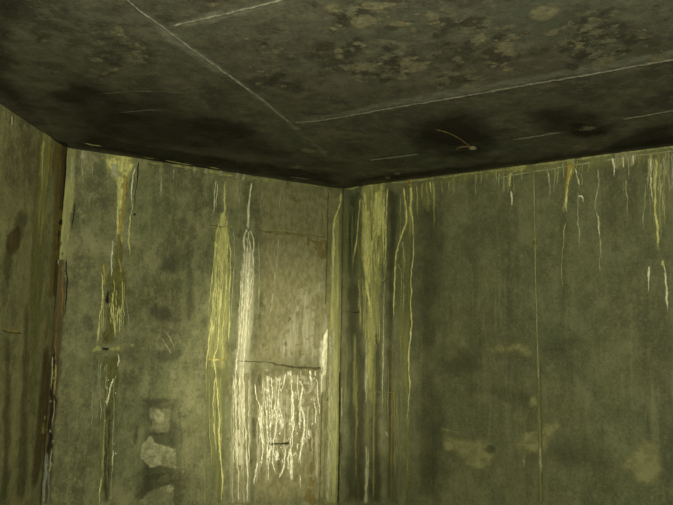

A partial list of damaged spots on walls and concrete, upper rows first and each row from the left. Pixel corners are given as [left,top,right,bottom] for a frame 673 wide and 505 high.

corrosion [30,132,68,503]
water stain [91,354,120,503]
spalling [140,407,177,468]
crack [208,359,320,376]
water stain [205,146,673,504]